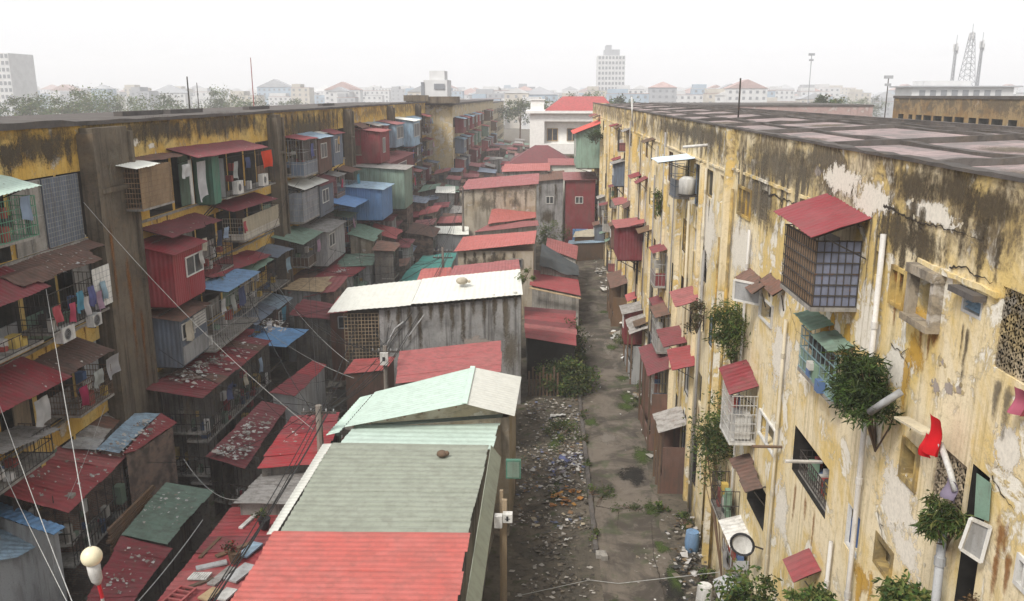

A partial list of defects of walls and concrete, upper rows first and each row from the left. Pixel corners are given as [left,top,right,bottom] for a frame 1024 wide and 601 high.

damp [0,131,72,175]
damp [128,112,256,147]
damp [660,121,737,163]
damp [738,124,849,228]
flaking render [815,162,963,233]
crack [883,204,985,241]
damp [863,168,1017,291]
crack [949,265,992,284]
damp [386,292,519,367]